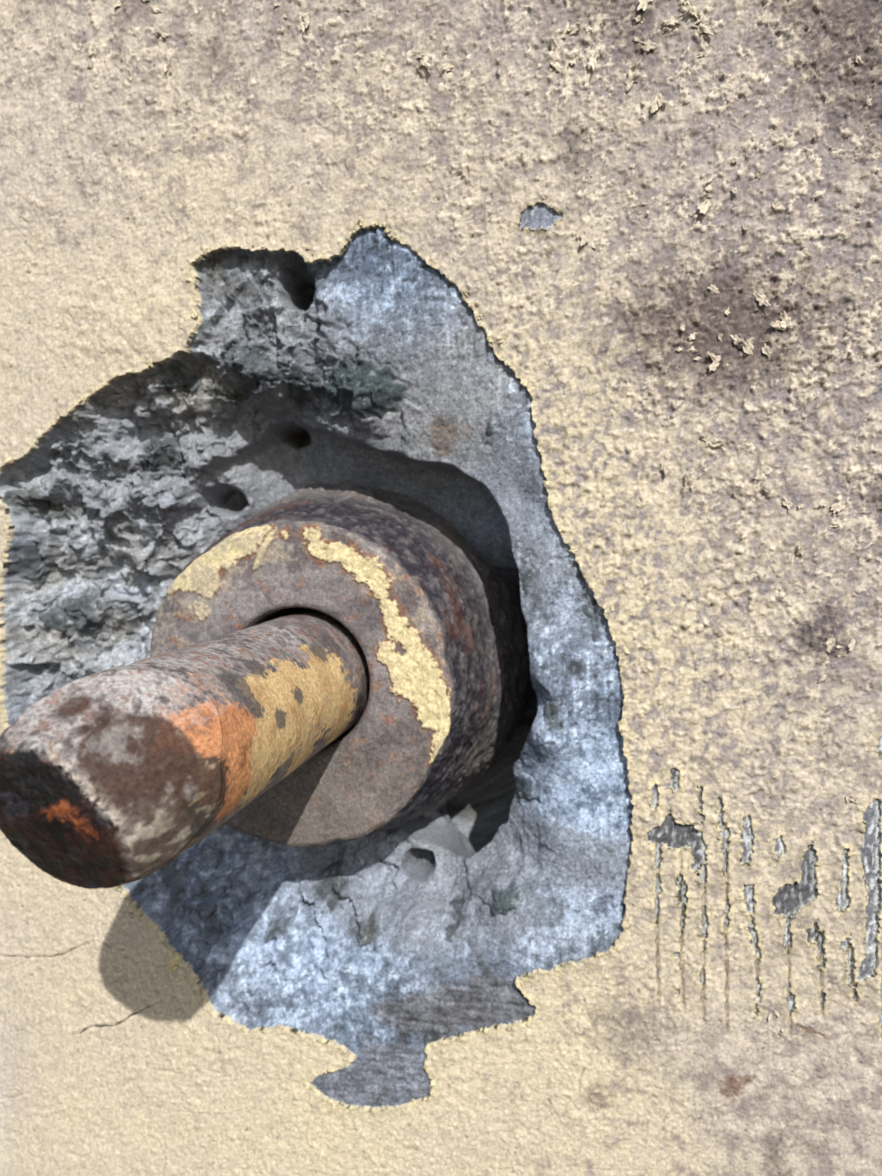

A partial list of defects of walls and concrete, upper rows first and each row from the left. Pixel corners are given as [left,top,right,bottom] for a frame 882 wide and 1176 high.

peeling [518,203,563,230]
peeling [697,177,713,214]
peeling [753,290,793,331]
peeling [675,323,773,373]
spalling [0,217,755,1115]
peeling [818,633,856,683]
peeling [774,835,786,858]
peeling [743,884,762,961]
peeling [772,841,818,954]
peeling [806,923,826,969]
peeling [835,795,882,1027]
peeling [754,981,796,1038]